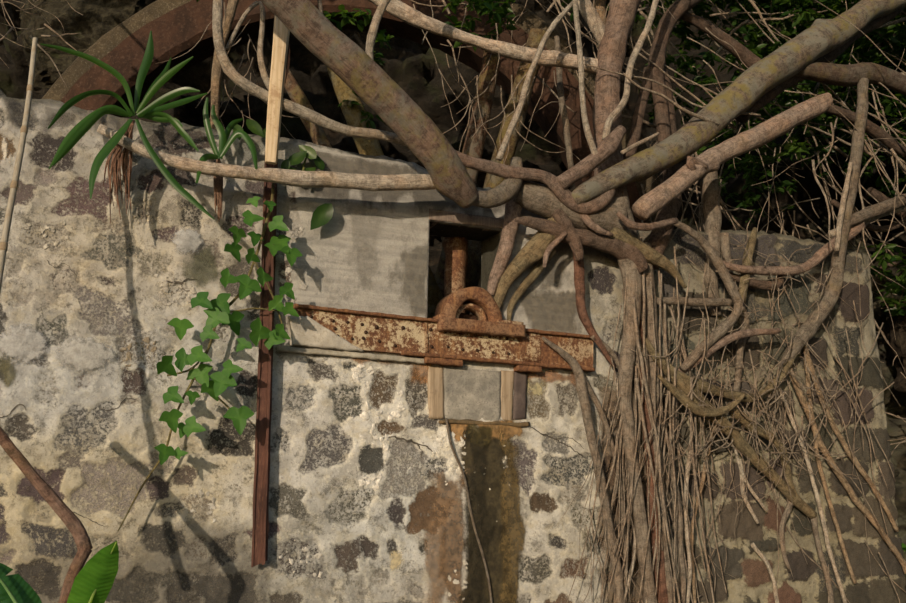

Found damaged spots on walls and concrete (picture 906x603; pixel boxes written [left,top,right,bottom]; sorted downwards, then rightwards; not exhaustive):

rust [409,362,433,382]
rust [424,468,469,603]
damp [459,430,526,603]